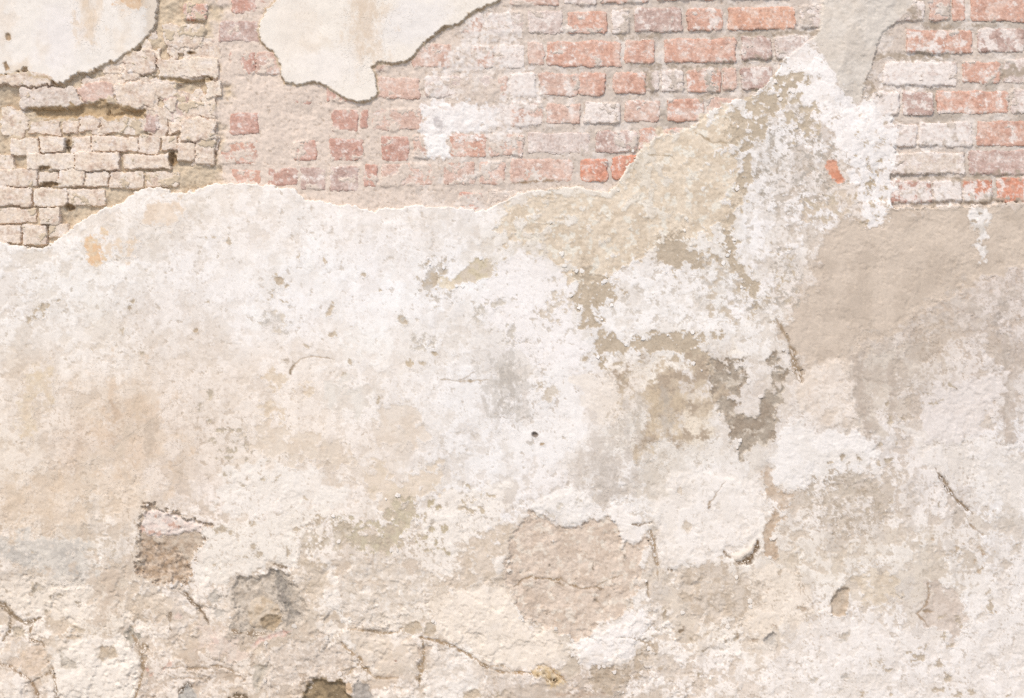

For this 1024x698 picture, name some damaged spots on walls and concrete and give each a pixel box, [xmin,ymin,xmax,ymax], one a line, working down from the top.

flaking render [0,0,162,88]
spalling [25,97,148,124]
spalling [151,72,215,87]
flaking render [256,0,502,105]
peeling [413,67,891,463]
peeling [324,300,339,339]
peeling [394,314,441,369]
flaking render [132,499,235,588]
flaking render [173,356,899,698]
crack [934,467,984,536]
crack [0,601,59,698]